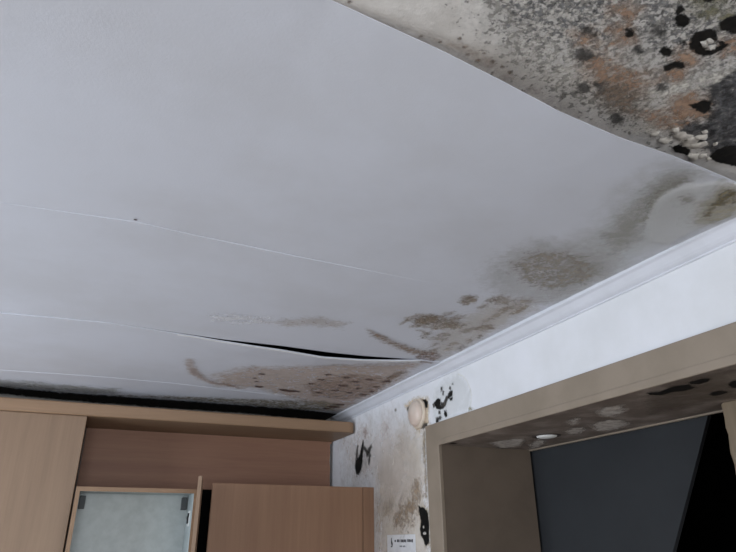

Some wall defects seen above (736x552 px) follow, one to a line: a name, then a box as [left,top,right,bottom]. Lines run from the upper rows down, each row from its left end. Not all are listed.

leakage [476,0,736,166]
leakage [704,189,736,217]
crack [177,334,403,362]
leakage [370,332,440,363]
leakage [0,386,344,420]
leakage [422,387,453,429]
leakage [647,378,709,395]
leakage [355,442,372,475]
leakage [380,436,425,552]